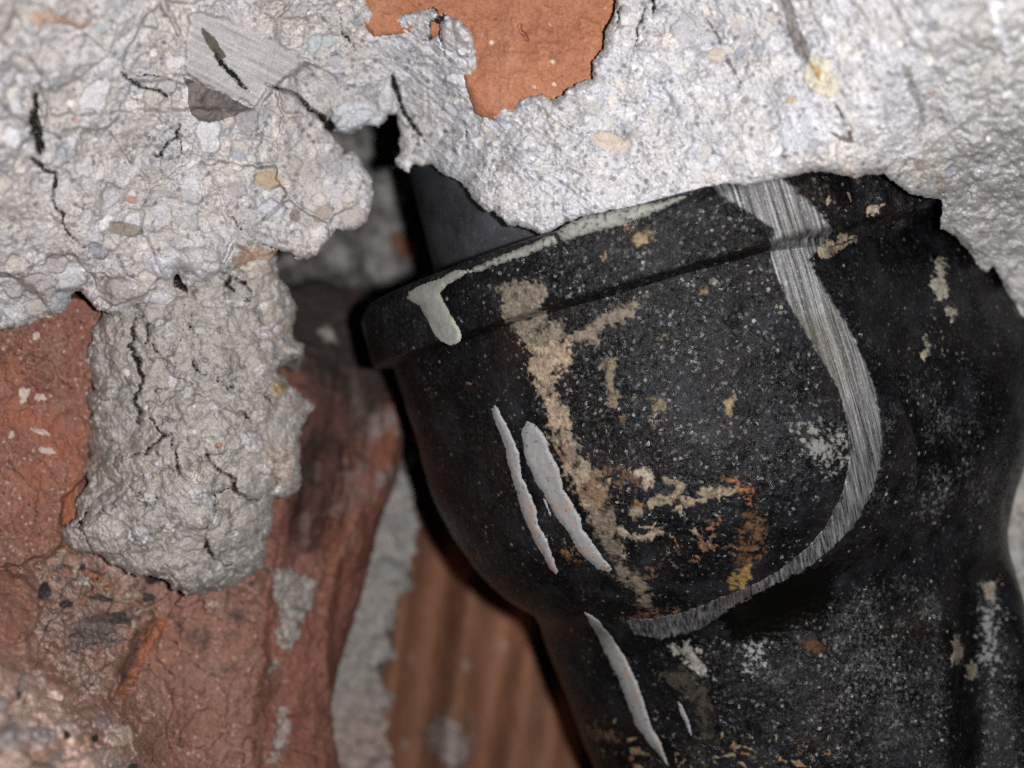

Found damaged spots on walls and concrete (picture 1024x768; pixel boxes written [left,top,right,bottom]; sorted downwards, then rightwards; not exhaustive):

crack [29,93,88,248]
crack [127,274,276,477]
crack [204,447,261,566]